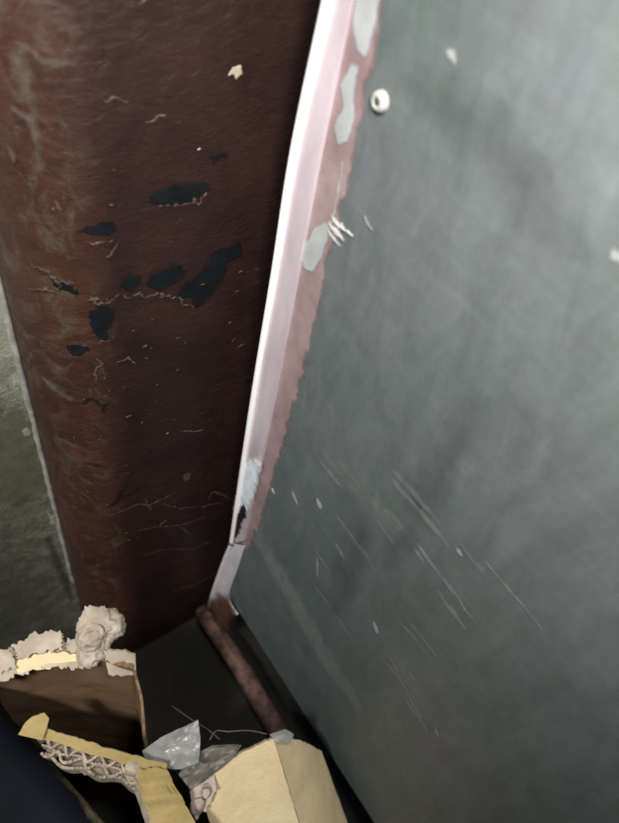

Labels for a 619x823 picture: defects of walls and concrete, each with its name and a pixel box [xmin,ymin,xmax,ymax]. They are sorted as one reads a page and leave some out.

peeling [352,0,379,57]
peeling [334,64,358,145]
peeling [78,221,115,245]
peeling [151,182,210,207]
peeling [302,167,353,272]
peeling [88,242,242,344]